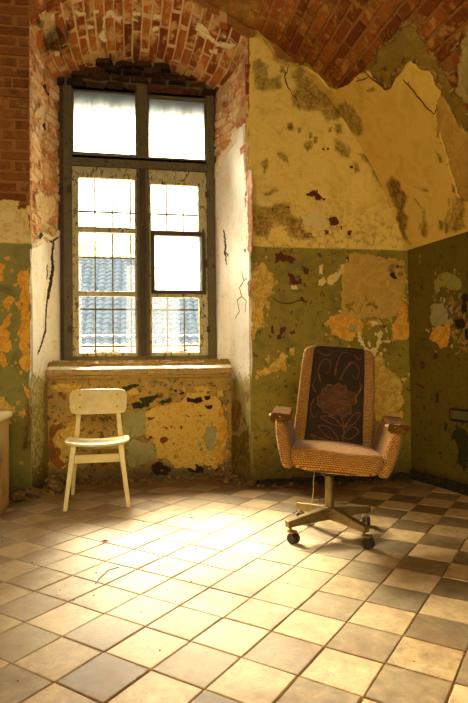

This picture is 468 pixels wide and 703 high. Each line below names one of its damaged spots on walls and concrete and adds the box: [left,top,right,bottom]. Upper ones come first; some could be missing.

water stain [254,59,284,90]
water stain [293,67,361,135]
crack [355,71,438,114]
spalling [372,30,468,202]
water stain [253,204,314,238]
water stain [362,155,407,240]
peeling [0,256,81,473]
crack [37,237,59,355]
crack [223,230,247,317]
spalling [318,252,424,421]
spalling [426,268,468,364]
spalling [116,384,250,481]